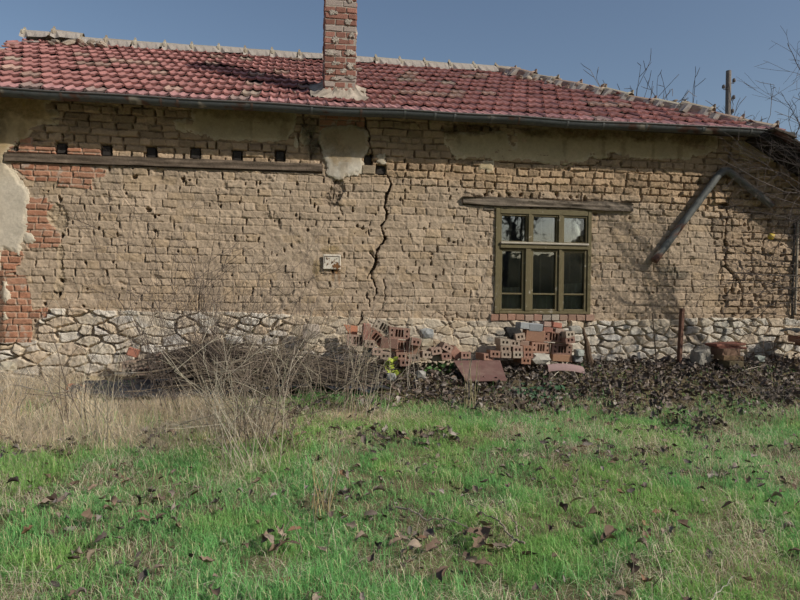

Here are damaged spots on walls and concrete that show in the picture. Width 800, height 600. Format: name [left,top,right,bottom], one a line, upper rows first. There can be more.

flaking render [0,97,60,270]
flaking render [318,125,386,207]
crack [364,117,374,158]
flaking render [441,126,718,174]
spalling [47,202,71,232]
crack [718,138,743,306]
spalling [53,242,68,297]
crack [357,174,392,326]
flaking render [0,281,11,320]